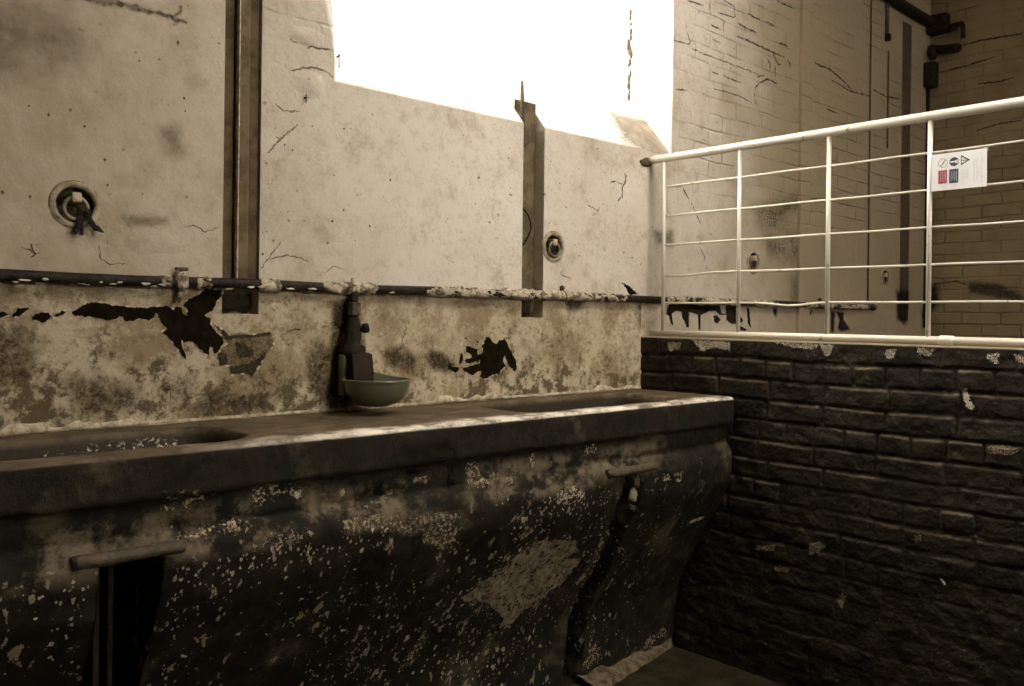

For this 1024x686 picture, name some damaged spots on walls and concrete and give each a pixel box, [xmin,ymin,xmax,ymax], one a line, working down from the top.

crack [86,0,187,24]
crack [290,39,333,78]
crack [674,0,794,104]
crack [815,62,899,113]
crack [268,105,299,153]
crack [588,175,626,214]
flaking render [0,288,275,376]
damp [666,296,779,331]
damp [0,330,29,386]
flaking render [448,337,518,380]
damp [70,379,136,408]
spalling [430,485,619,680]